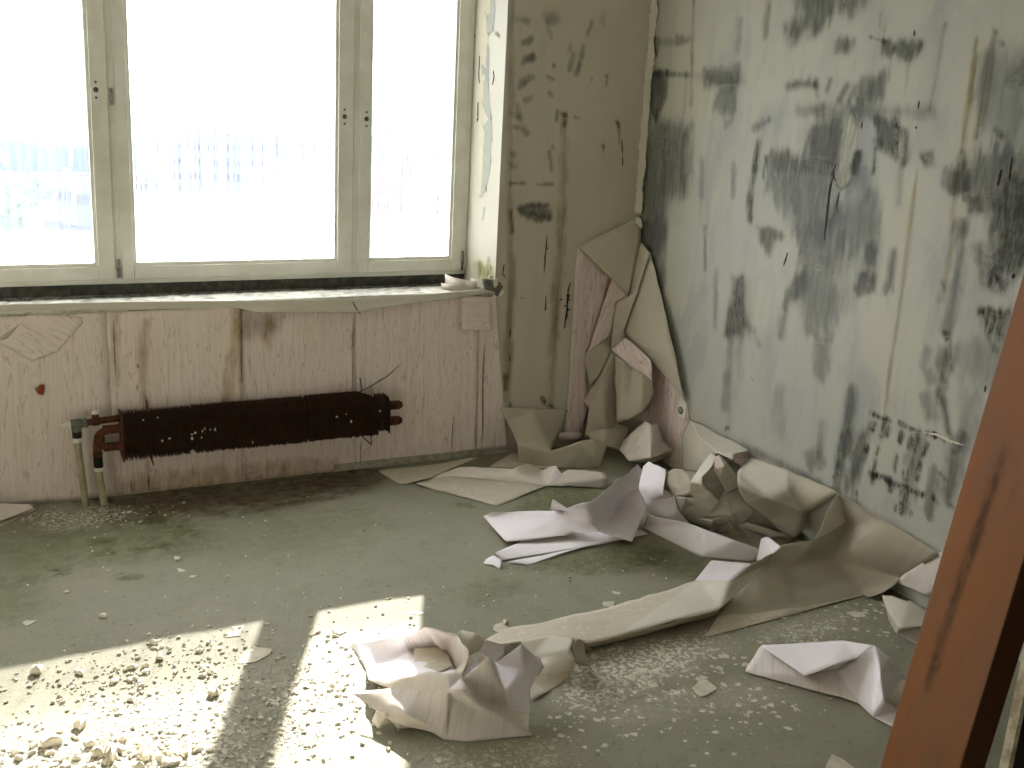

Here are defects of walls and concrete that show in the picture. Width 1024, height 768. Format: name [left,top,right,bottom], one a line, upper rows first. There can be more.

water stain [790,0,854,37]
water stain [871,36,922,60]
peeling [474,0,495,221]
water stain [642,71,686,246]
water stain [852,116,907,174]
water stain [954,152,1024,290]
water stain [726,279,745,334]
water stain [978,309,1005,352]
water stain [836,401,937,514]